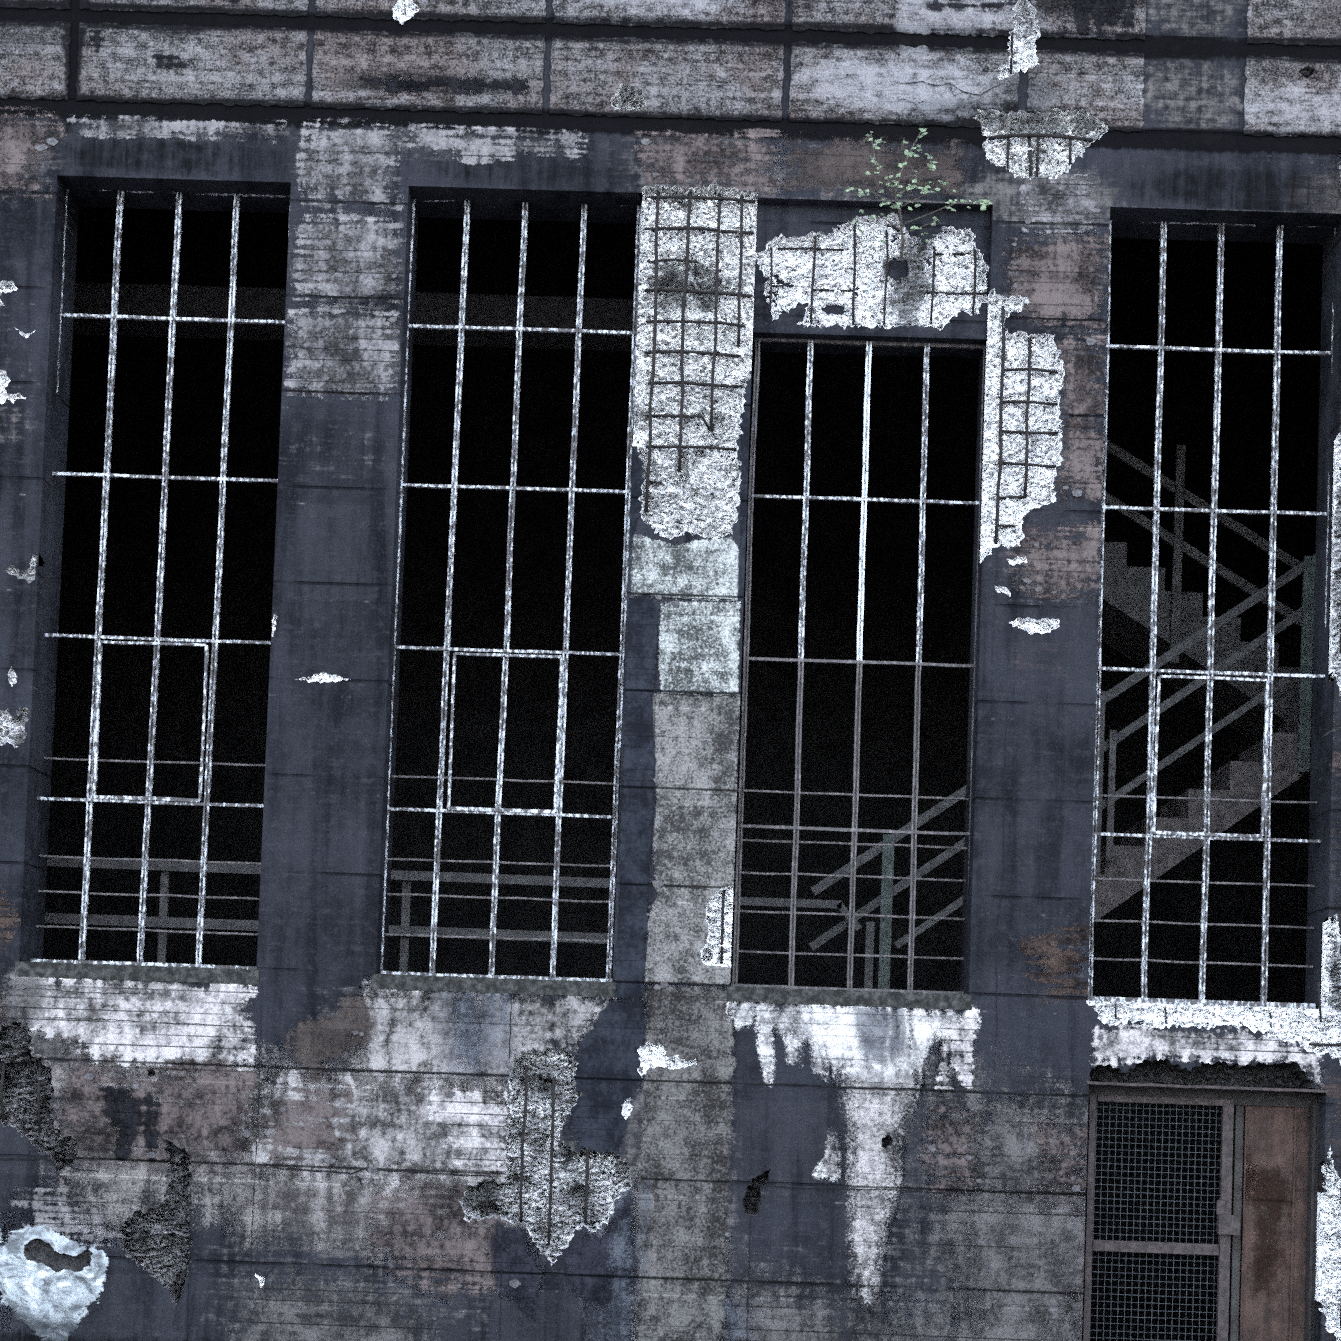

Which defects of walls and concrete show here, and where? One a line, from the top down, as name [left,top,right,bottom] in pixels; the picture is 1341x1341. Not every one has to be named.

spalling [0,106,1109,1341]
spalling [1328,418,1341,732]
water stain [725,1002,981,1304]
spalling [1086,904,1341,1341]
rust [1246,1165,1298,1296]